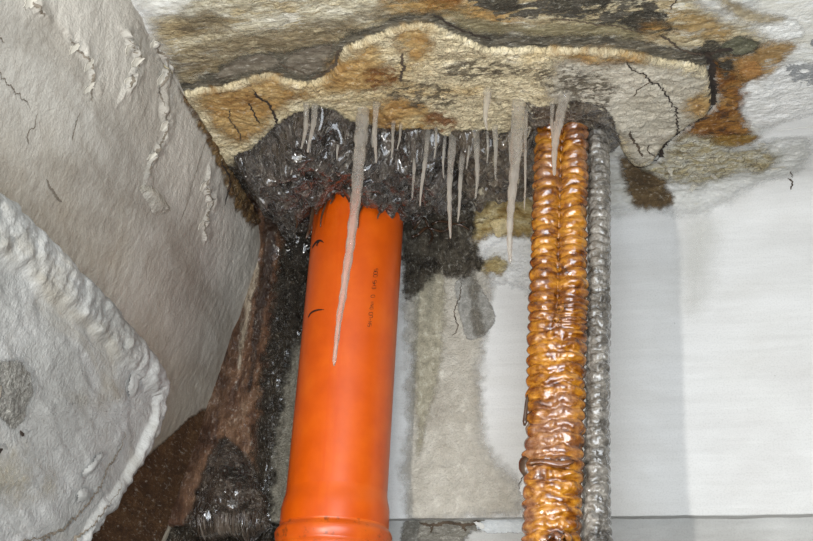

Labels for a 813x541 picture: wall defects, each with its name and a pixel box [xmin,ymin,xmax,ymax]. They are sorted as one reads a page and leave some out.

rust [387,0,519,23]
crack [0,72,37,144]
crack [228,89,278,141]
spalling [183,22,775,185]
crack [549,18,733,168]
rust [676,41,796,150]
crack [46,179,62,202]
damp [91,100,809,541]